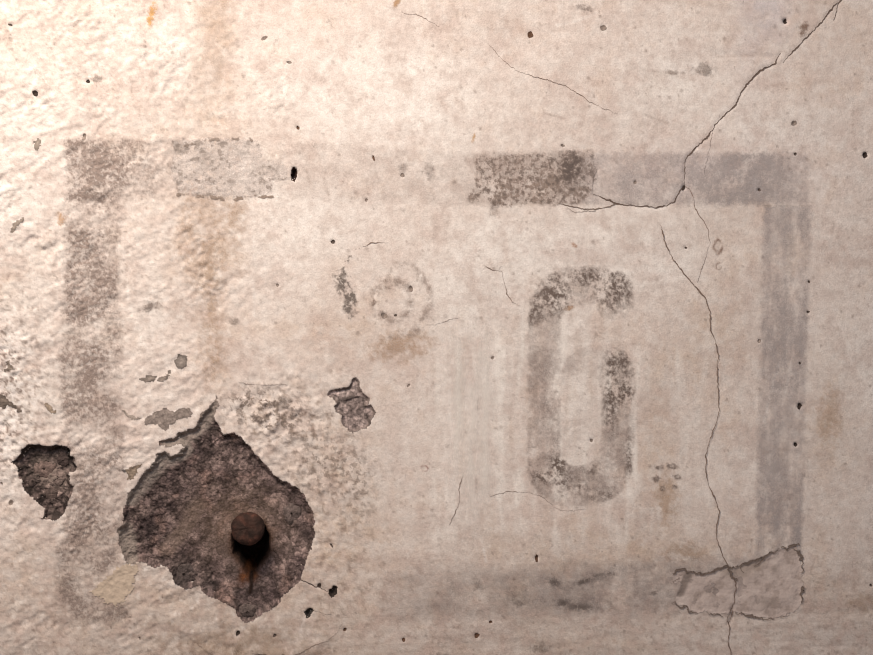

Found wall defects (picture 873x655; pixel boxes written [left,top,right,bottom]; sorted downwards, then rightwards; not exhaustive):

crack [593,0,842,652]
spalling [327,377,376,433]
spalling [11,444,77,521]
spalling [117,393,315,636]
peeling [672,543,805,620]